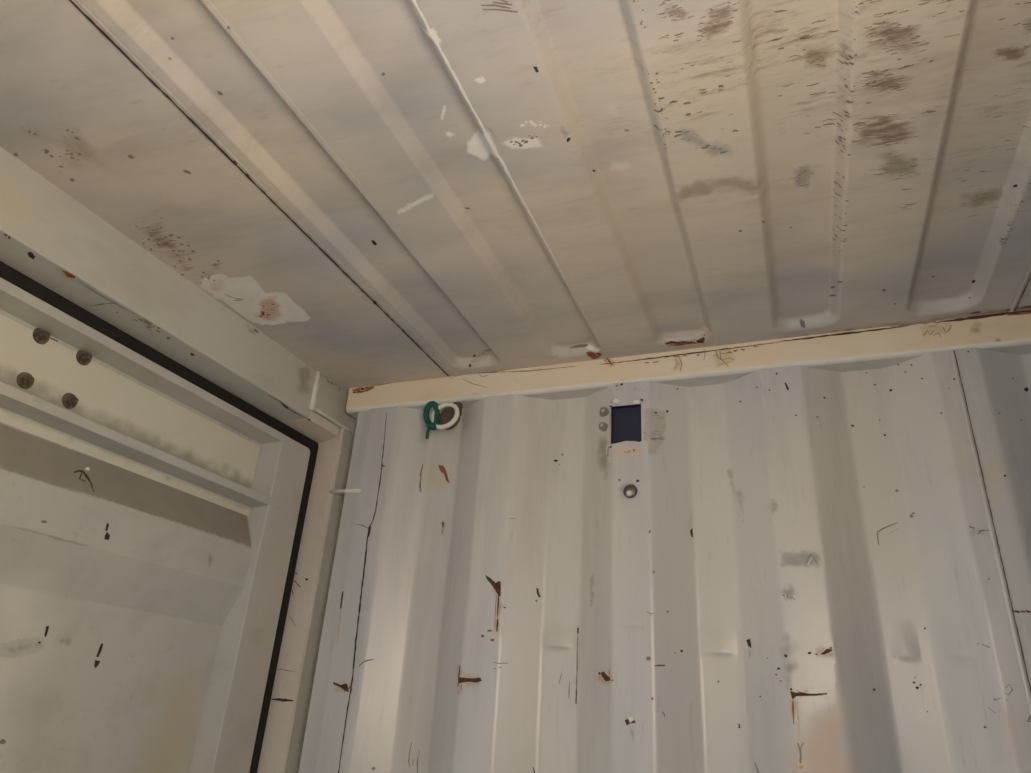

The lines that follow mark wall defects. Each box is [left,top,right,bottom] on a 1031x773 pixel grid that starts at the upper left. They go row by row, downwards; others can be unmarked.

peeling [438,102,575,170]
peeling [199,274,314,326]
corrosion [600,298,1031,392]
corrosion [807,642,840,664]